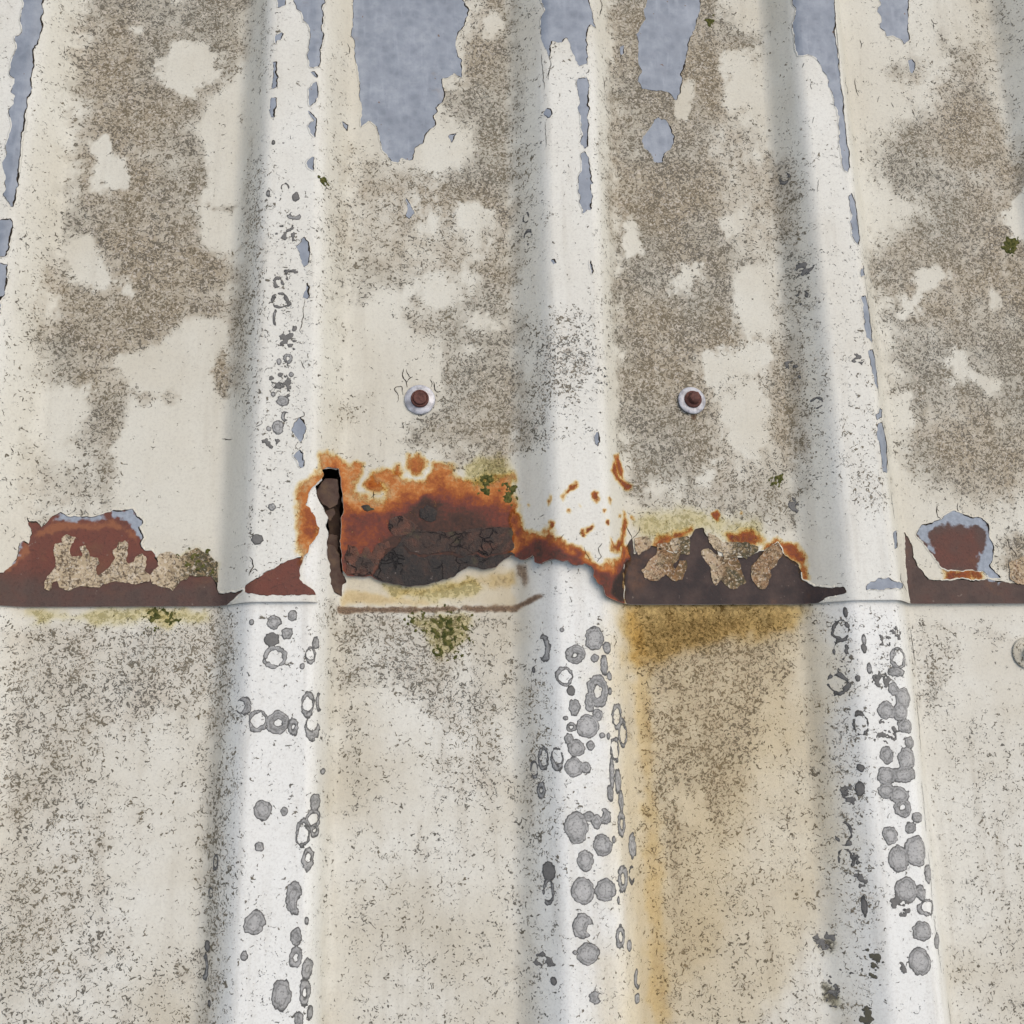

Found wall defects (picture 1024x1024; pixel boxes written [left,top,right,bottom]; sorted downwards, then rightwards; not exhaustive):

peeling [0,0,44,316]
peeling [342,0,471,164]
peeling [539,0,597,214]
peeling [640,116,676,164]
peeling [618,0,702,100]
peeling [791,0,850,173]
peeling [848,193,860,246]
peeling [860,295,878,391]
peeling [876,408,888,473]
corrosion [0,454,847,607]
corrosion [903,509,1024,604]